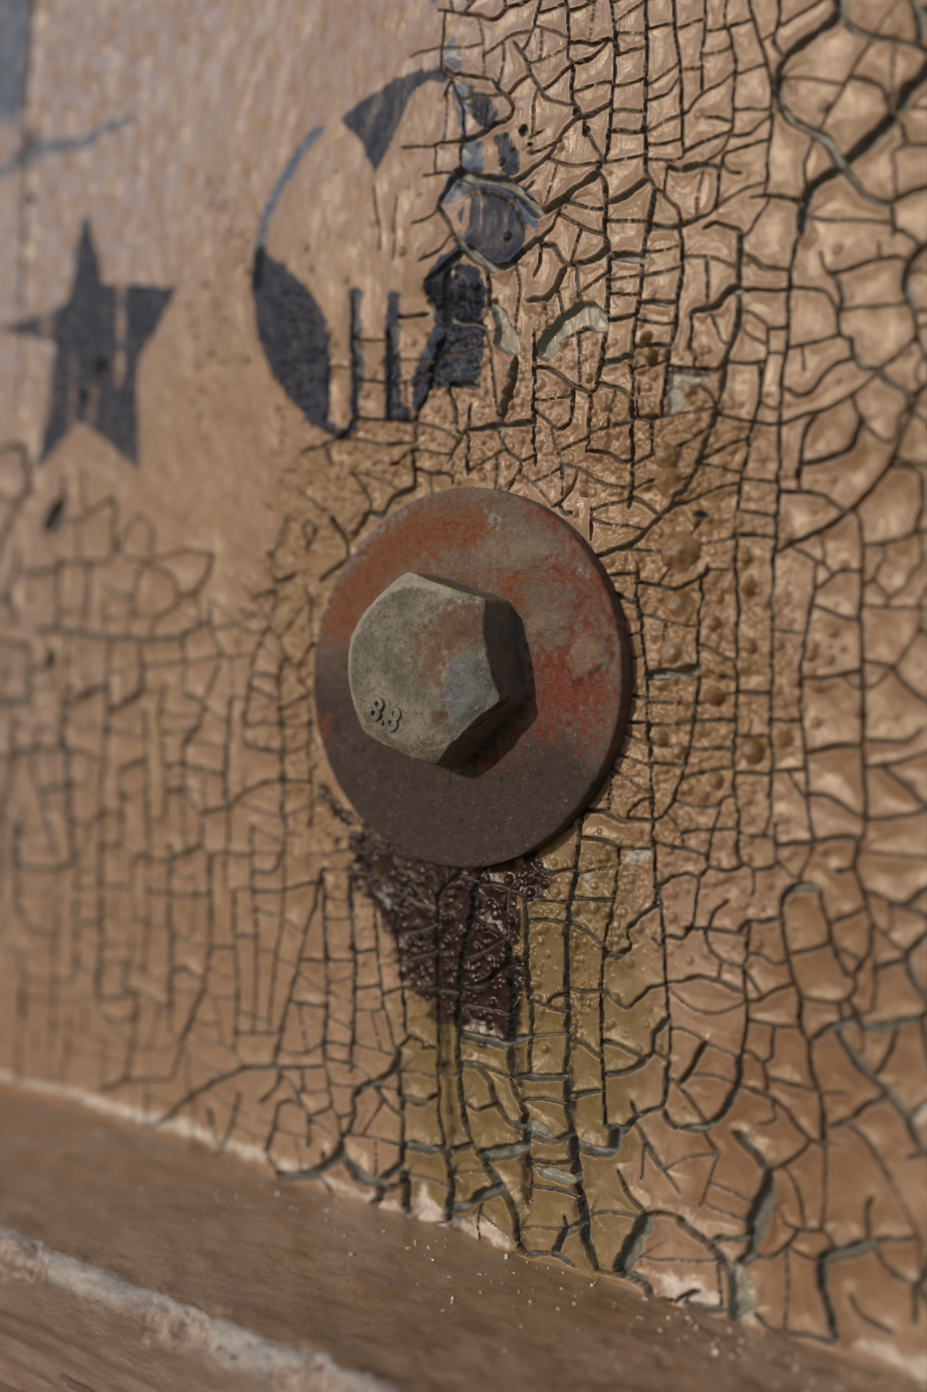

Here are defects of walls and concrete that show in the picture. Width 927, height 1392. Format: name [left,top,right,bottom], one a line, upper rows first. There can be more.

crack [401,140,444,149]
crack [372,186,398,261]
peeling [490,300,610,362]
crack [650,316,736,398]
crack [310,380,464,582]
crack [0,469,298,893]
crack [29,589,440,950]
crack [625,733,657,759]
crack [380,911,518,1044]
crack [336,1099,395,1150]
crack [420,1071,506,1138]
crack [638,1126,731,1214]